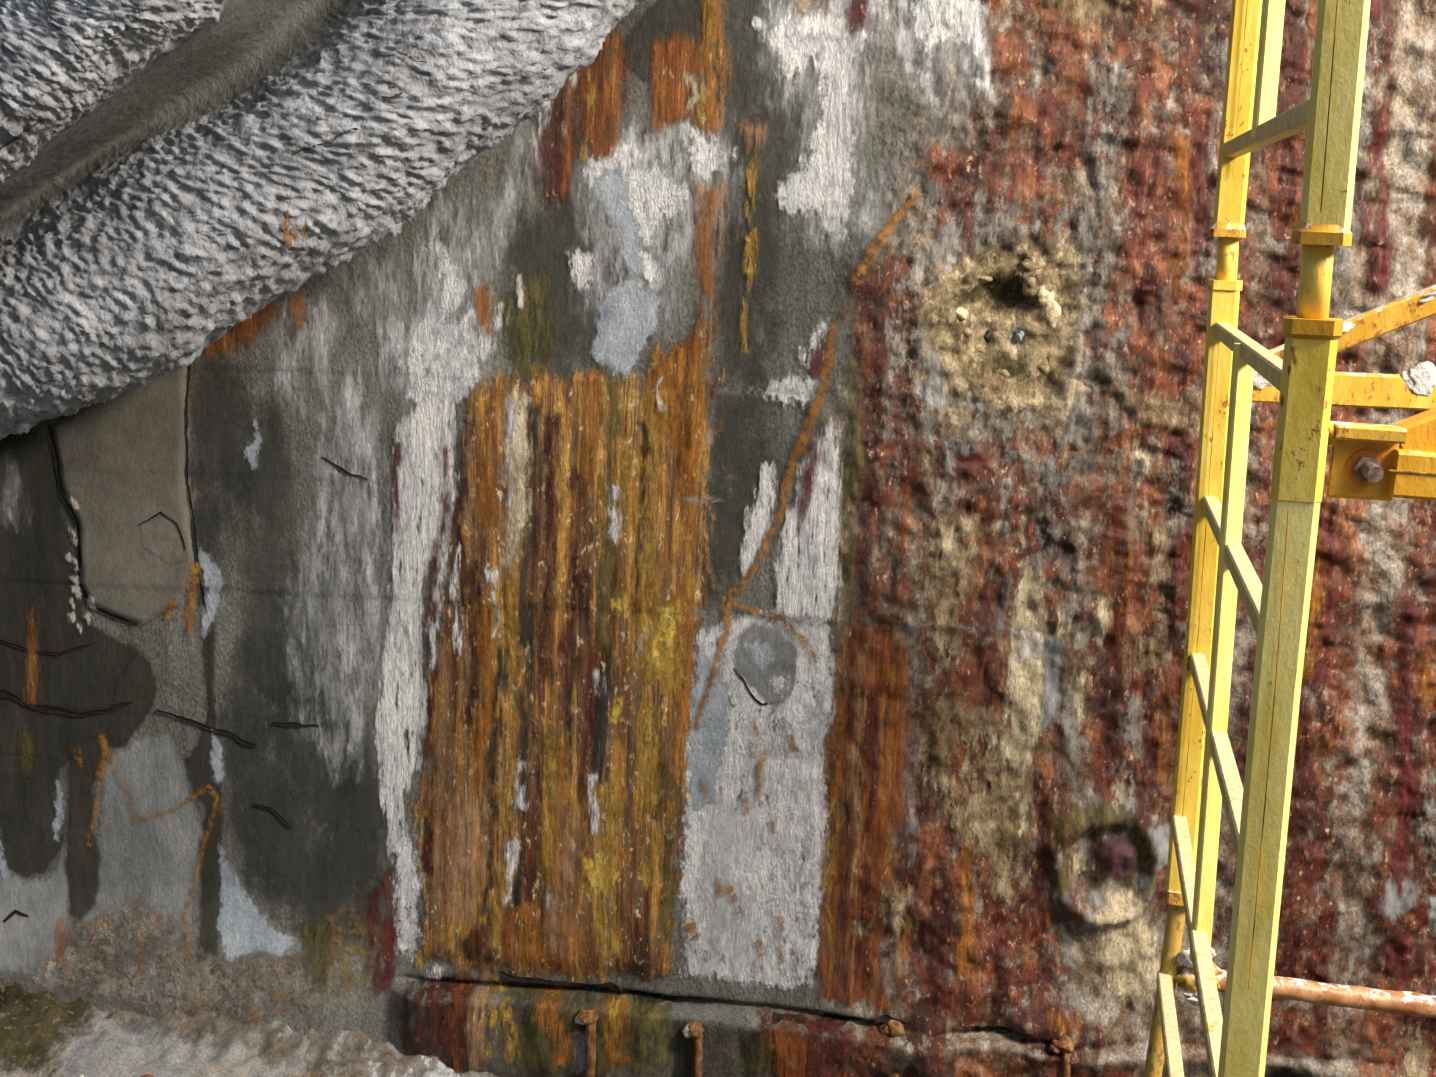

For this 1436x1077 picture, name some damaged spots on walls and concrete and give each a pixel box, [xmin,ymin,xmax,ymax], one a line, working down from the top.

corrosion [1276,0,1318,115]
spalling [916,230,1086,428]
corrosion [1237,130,1307,350]
crack [0,422,137,656]
crack [138,364,204,605]
damp [0,0,1202,1005]
corrosion [304,0,1232,1077]
corrosion [1274,445,1436,995]
damp [368,1055,464,1077]
crack [498,971,713,1015]
crack [744,1012,910,1074]
damp [1094,885,1162,1019]